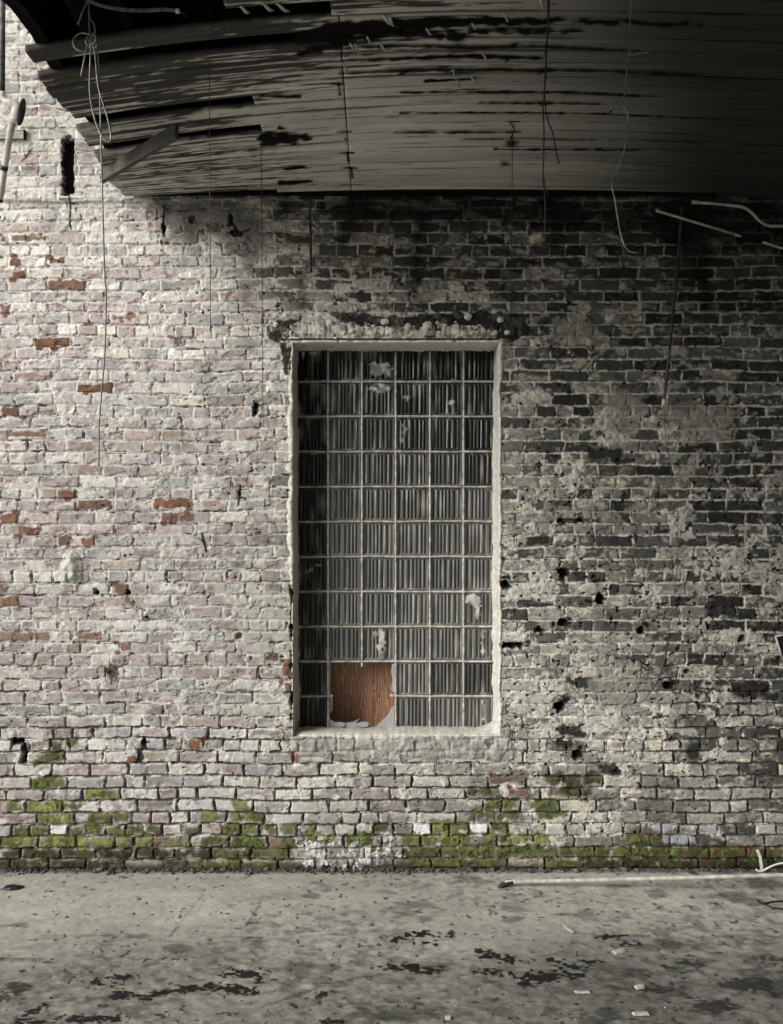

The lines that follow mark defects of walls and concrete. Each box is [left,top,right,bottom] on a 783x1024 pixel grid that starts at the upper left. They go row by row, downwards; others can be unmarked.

spalling [60,134,75,195]
leakage [663,196,712,285]
spalling [268,319,298,342]
spalling [330,310,529,343]
spalling [553,697,569,710]
spalling [13,737,29,764]
leakage [51,824,68,834]
leakage [413,822,430,835]
leakage [469,821,487,833]
leakage [639,822,718,858]